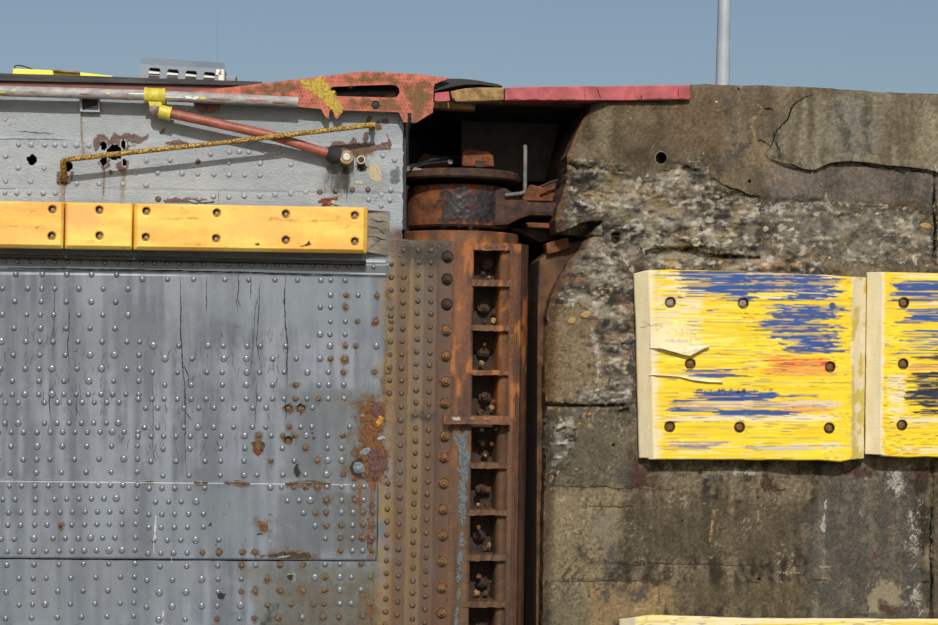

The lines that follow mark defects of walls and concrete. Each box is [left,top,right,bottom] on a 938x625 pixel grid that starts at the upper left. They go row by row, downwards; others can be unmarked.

crack [715,180,760,198]
crack [758,95,937,259]
spalling [543,162,938,484]
rust [341,291,394,560]
rust [238,549,315,569]